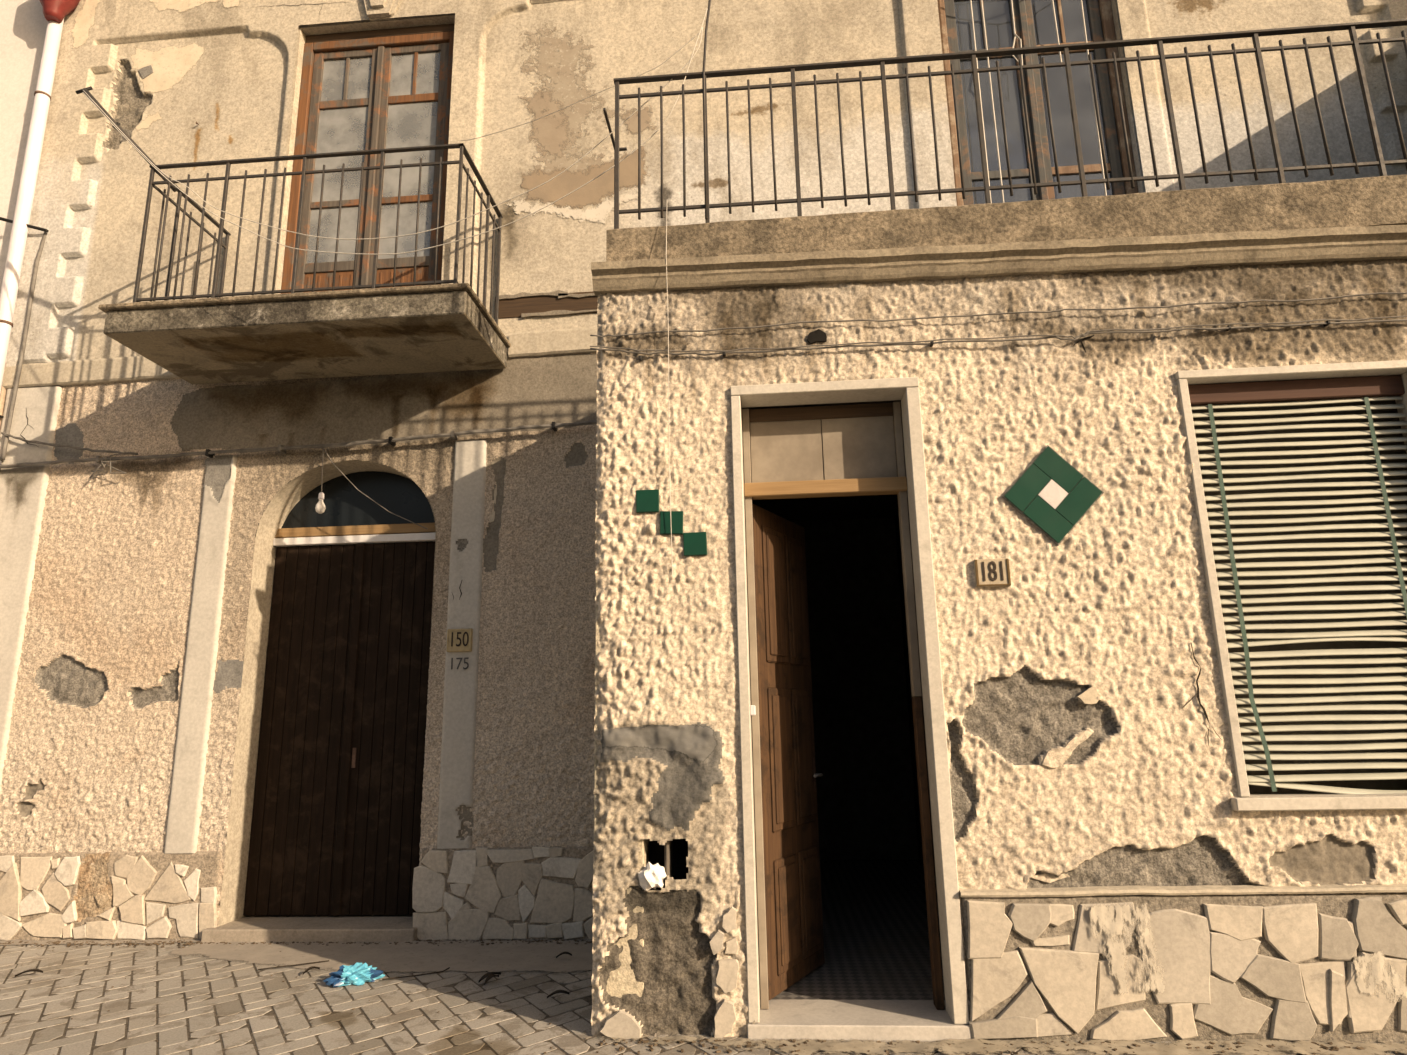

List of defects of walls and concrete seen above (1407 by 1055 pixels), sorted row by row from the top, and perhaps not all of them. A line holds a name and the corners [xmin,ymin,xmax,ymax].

peeling [148,0,239,12]
flaking render [102,43,205,156]
peeling [507,22,656,224]
flaking render [456,457,506,572]
flaking render [34,654,109,708]
flaking render [128,661,180,709]
flaking render [947,665,1121,842]
flaking render [16,778,46,817]
flaking render [1027,835,1260,888]
flaking render [1269,834,1376,886]
flaking render [597,839,739,1040]